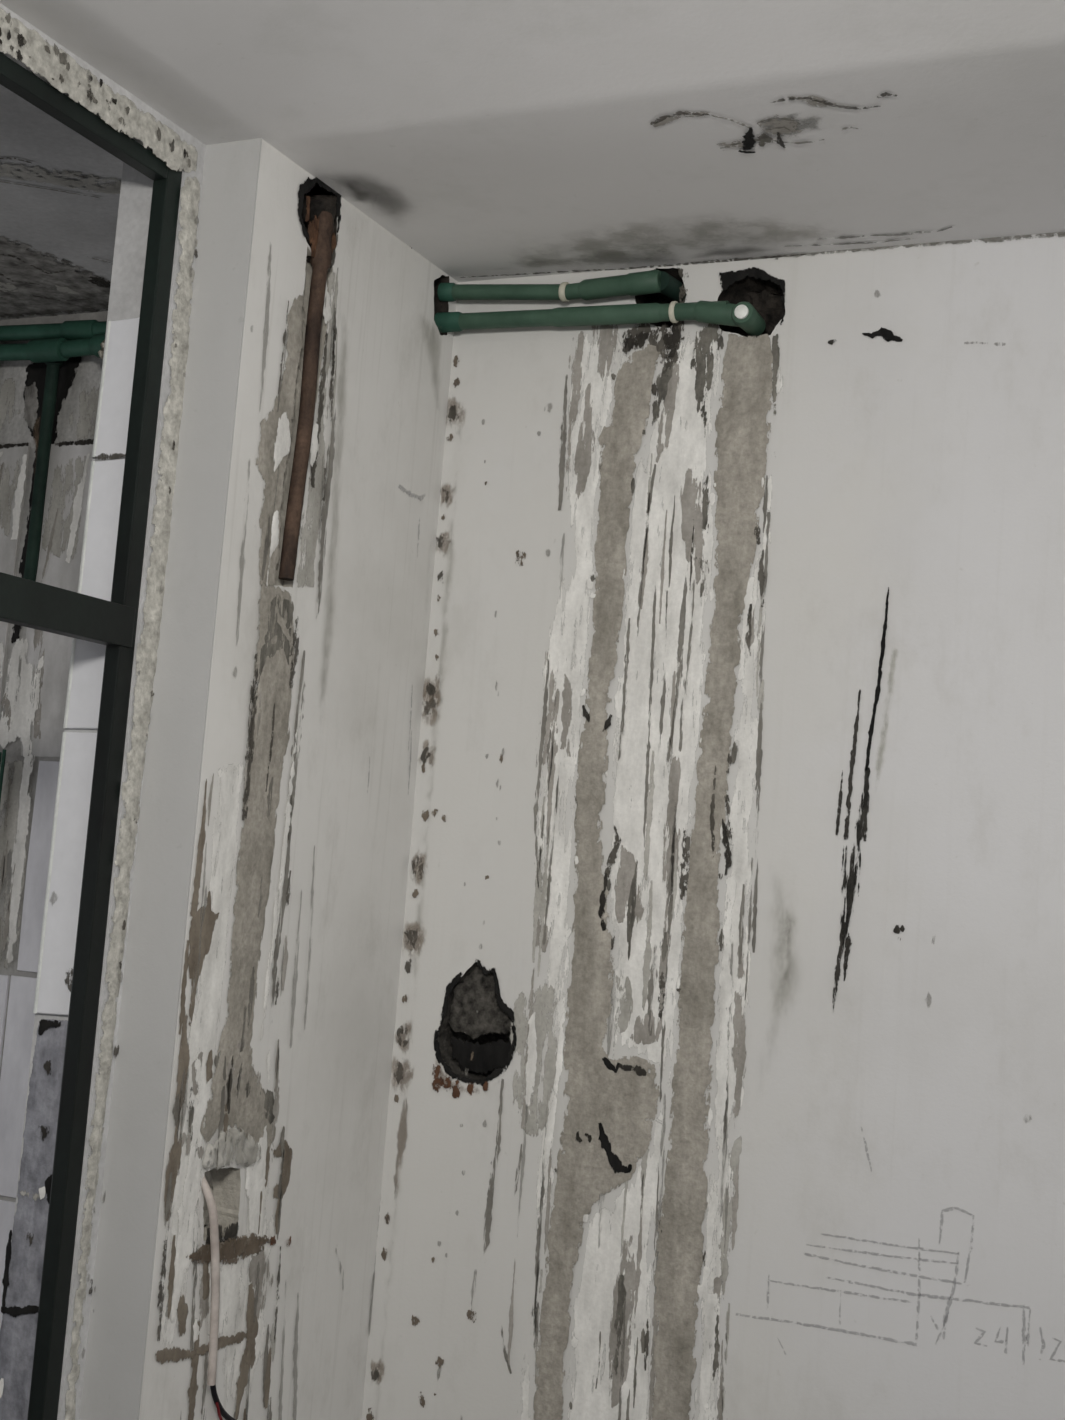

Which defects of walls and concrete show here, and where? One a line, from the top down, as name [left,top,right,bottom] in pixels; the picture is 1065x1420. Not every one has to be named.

rust [305,196,337,257]
leakage [460,254,806,278]
spalling [650,268,684,284]
spalling [424,683,436,715]
spalling [421,747,430,773]
peeling [567,275,785,1420]
spalling [412,856,424,898]
peeling [432,325,624,1420]
peeling [161,510,300,1347]
spalling [404,929,418,974]
spalling [393,1025,408,1103]